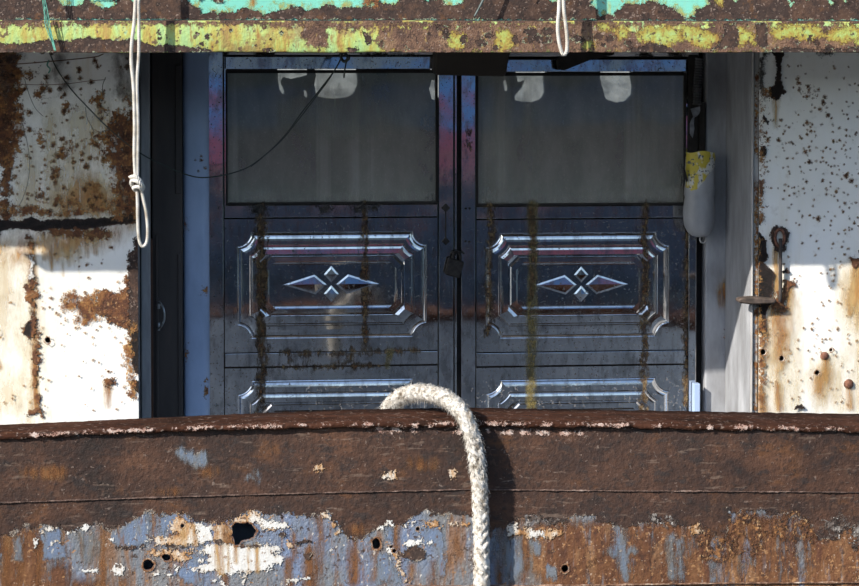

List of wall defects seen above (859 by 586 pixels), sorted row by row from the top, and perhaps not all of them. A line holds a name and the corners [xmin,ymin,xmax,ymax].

peeling [493,27,516,52]
peeling [597,22,720,50]
peeling [769,22,859,45]
water stain [250,200,421,413]
corrosion [0,0,859,419]
water stain [483,202,497,337]
water stain [526,200,538,409]
water stain [637,199,650,410]
peeling [33,524,94,579]
peeling [109,510,296,586]
corrosion [0,419,474,586]
corrosion [477,419,859,586]